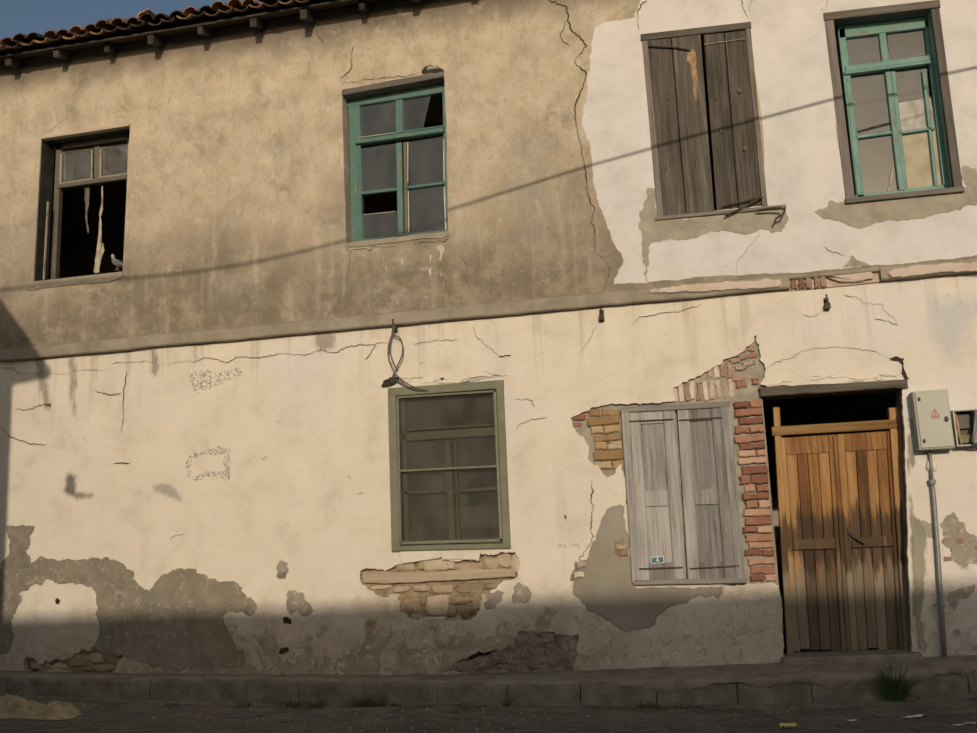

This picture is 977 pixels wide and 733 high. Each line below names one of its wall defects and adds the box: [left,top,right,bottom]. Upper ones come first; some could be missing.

crack [549,0,611,292]
crack [2,332,511,429]
flaking render [570,337,779,586]
flaking render [0,525,257,673]
flaking render [276,560,289,579]
flaking render [283,590,313,624]
flaking render [361,550,531,621]
flaking render [438,631,580,674]
crack [573,485,594,579]
flaking render [941,512,977,567]